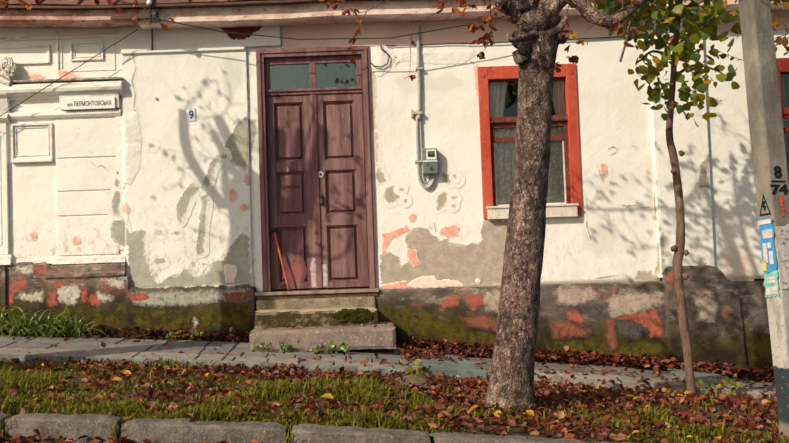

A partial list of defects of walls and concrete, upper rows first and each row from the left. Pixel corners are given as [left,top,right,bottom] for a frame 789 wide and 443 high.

flaking render [6,111,259,329]
flaking render [373,160,508,335]
water stain [578,299,649,343]
flaking render [693,154,714,194]